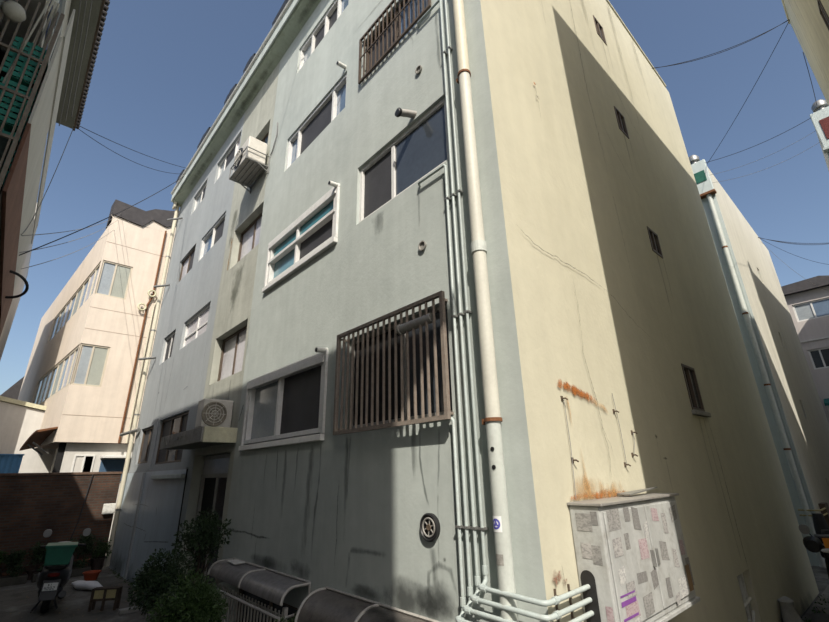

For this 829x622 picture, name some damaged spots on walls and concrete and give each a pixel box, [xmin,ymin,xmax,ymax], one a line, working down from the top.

rust [558,380,593,417]
rust [571,478,624,499]